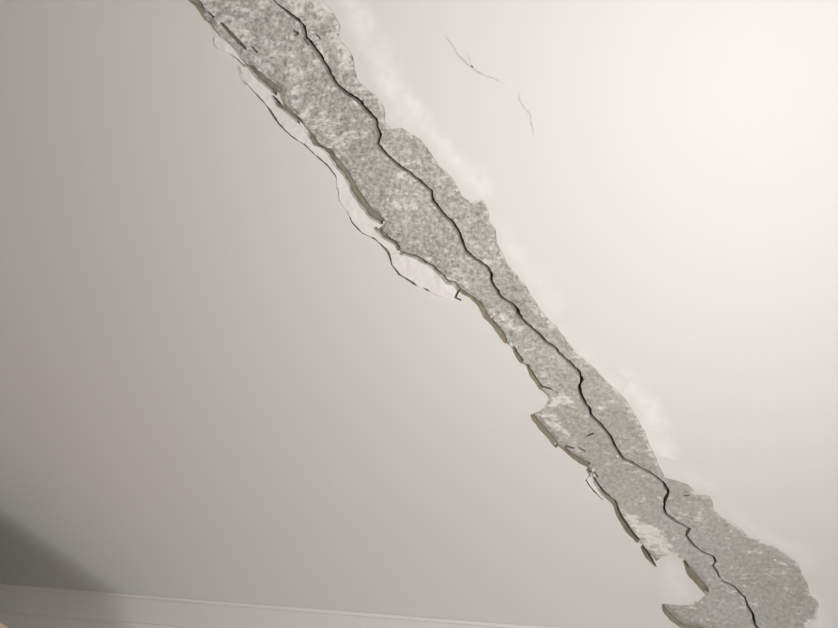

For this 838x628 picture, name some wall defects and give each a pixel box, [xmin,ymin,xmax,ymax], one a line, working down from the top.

spalling [188,0,835,628]
crack [273,0,759,628]